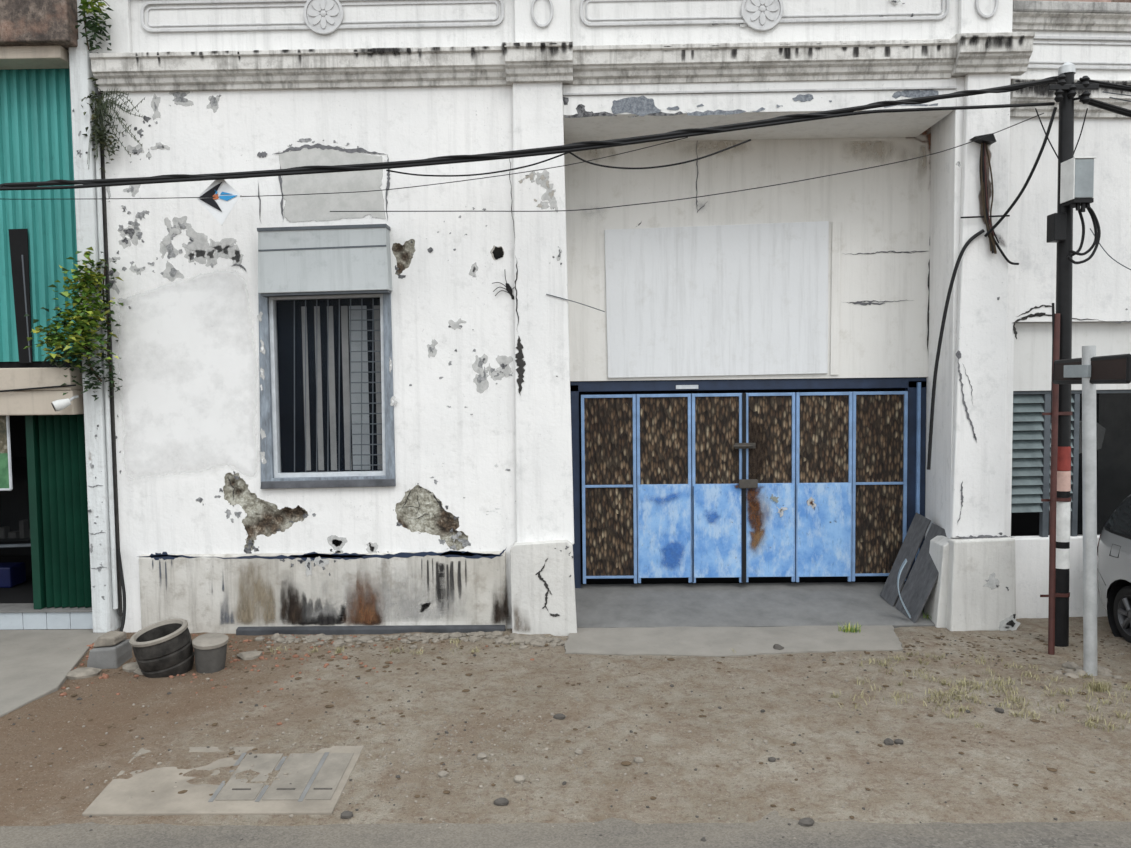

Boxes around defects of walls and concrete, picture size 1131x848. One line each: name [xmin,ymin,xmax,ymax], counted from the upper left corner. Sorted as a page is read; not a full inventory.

damp [354,47,440,57]
damp [502,42,573,55]
peeling [104,184,243,309]
flaking render [392,239,433,279]
crack [509,159,526,396]
crack [847,239,930,348]
crack [1013,305,1131,339]
flaking render [196,471,316,554]
flaking render [393,477,471,550]
rust [735,419,766,548]
damp [221,559,466,625]
crack [535,558,560,617]